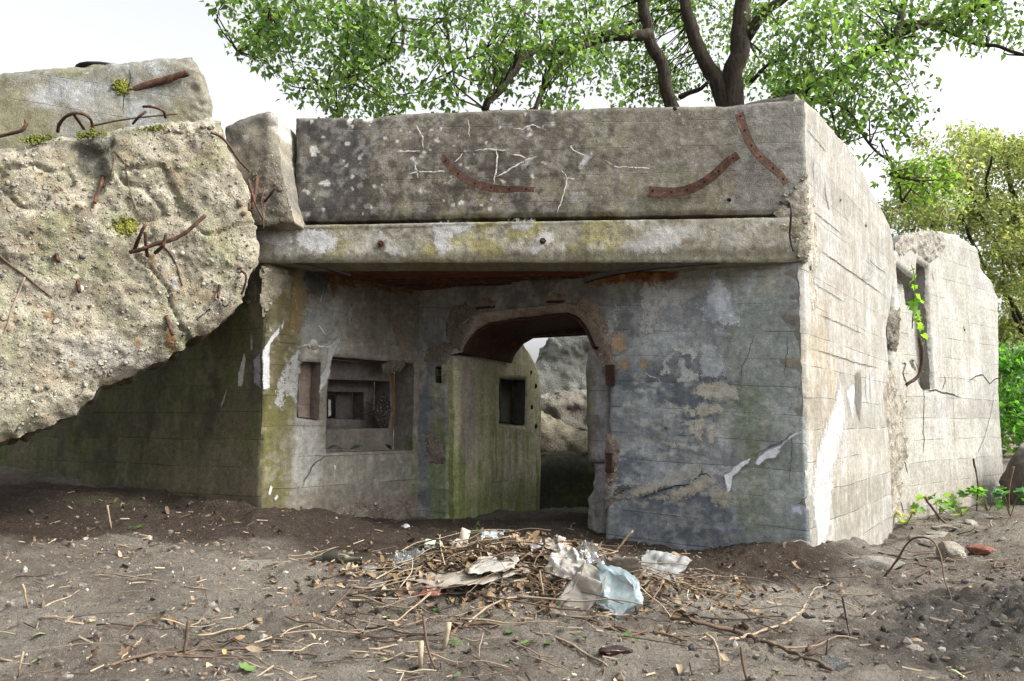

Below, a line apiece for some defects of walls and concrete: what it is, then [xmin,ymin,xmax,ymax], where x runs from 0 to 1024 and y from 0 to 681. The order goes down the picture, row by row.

crack [398,121,546,184]
crack [558,144,649,209]
spalling [774,173,820,311]
rust [591,271,679,286]
spalling [887,307,901,352]
spalling [883,337,924,519]
crack [638,465,711,499]